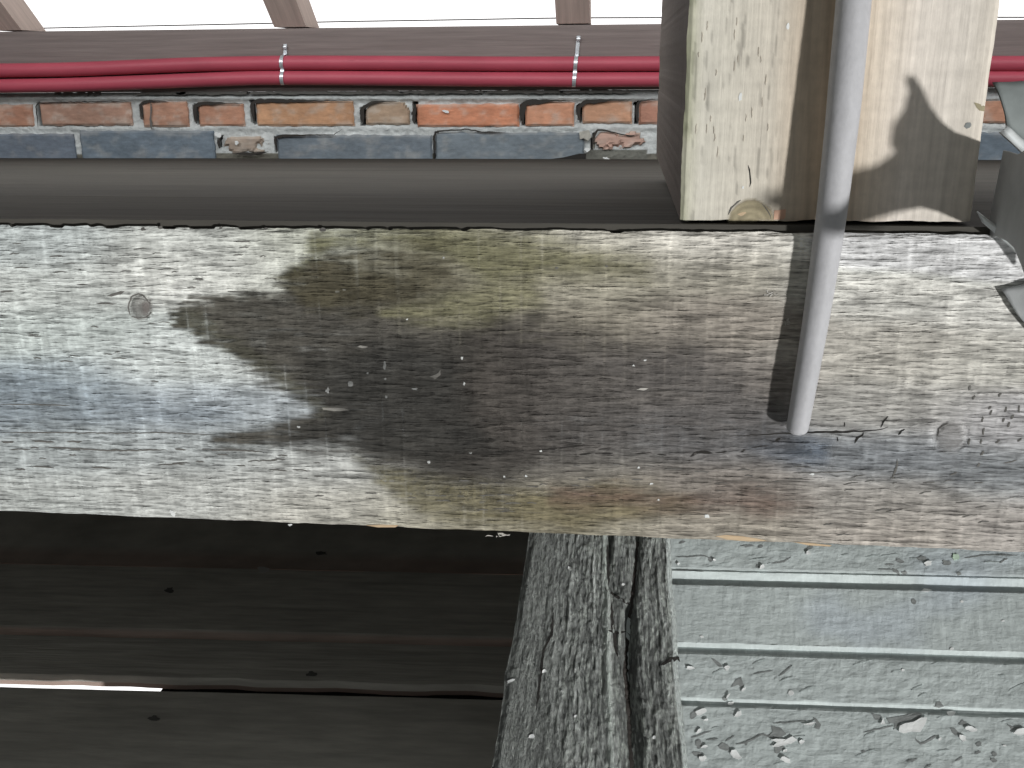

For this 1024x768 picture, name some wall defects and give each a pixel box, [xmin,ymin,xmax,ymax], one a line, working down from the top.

damp [169,251,778,479]
peeling [676,541,716,572]
peeling [917,556,961,575]
crack [605,541,639,768]
peeling [711,658,746,717]
peeling [690,708,821,763]
peeling [866,702,997,763]